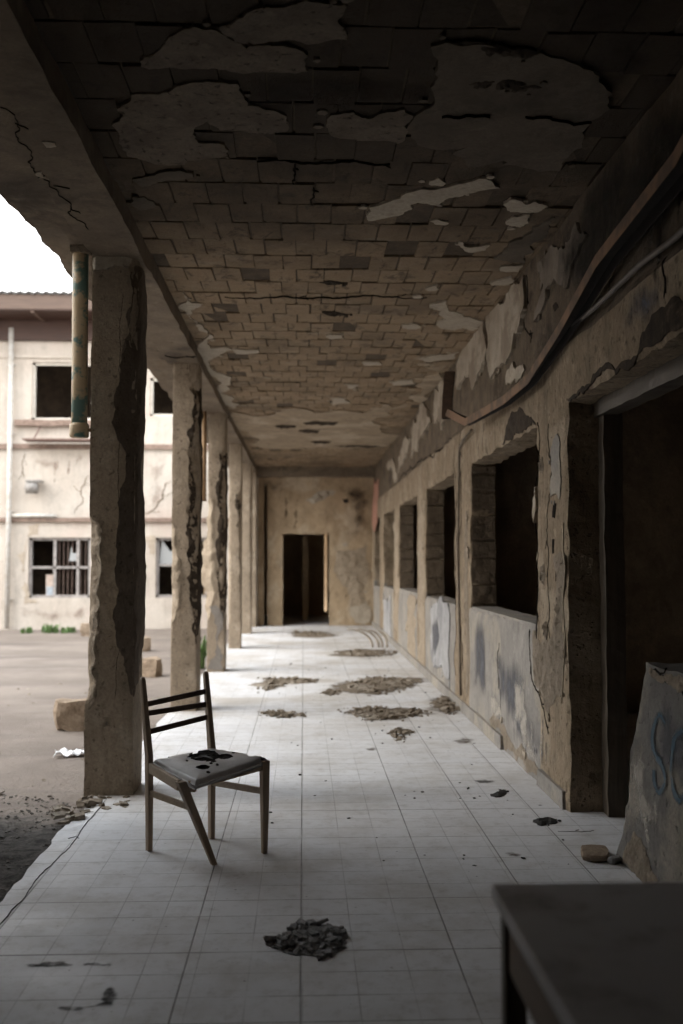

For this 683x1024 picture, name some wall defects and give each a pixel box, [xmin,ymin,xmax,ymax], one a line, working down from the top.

crack [0,107,88,229]
flaking render [112,0,354,166]
flaking render [313,32,612,230]
flaking render [178,222,585,532]
spalling [566,296,683,402]
spalling [88,266,156,709]
spalling [185,388,241,671]
water stain [476,630,543,760]